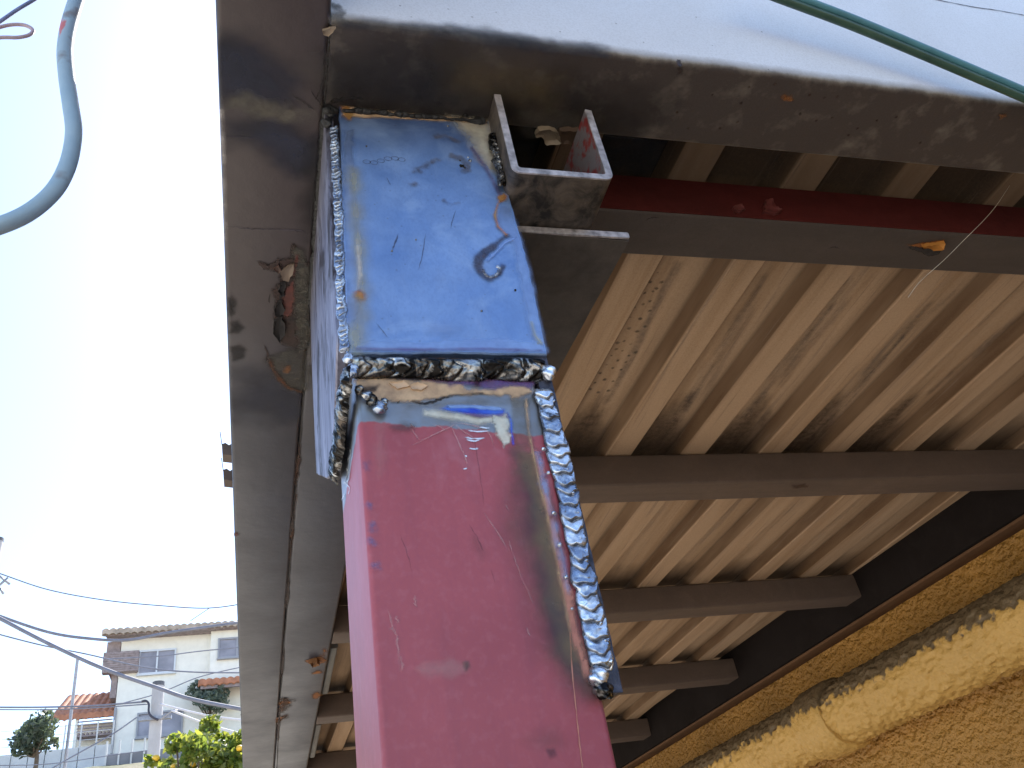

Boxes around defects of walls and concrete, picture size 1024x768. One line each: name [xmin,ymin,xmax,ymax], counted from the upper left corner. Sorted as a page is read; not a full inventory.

peeling [258,245,311,350]